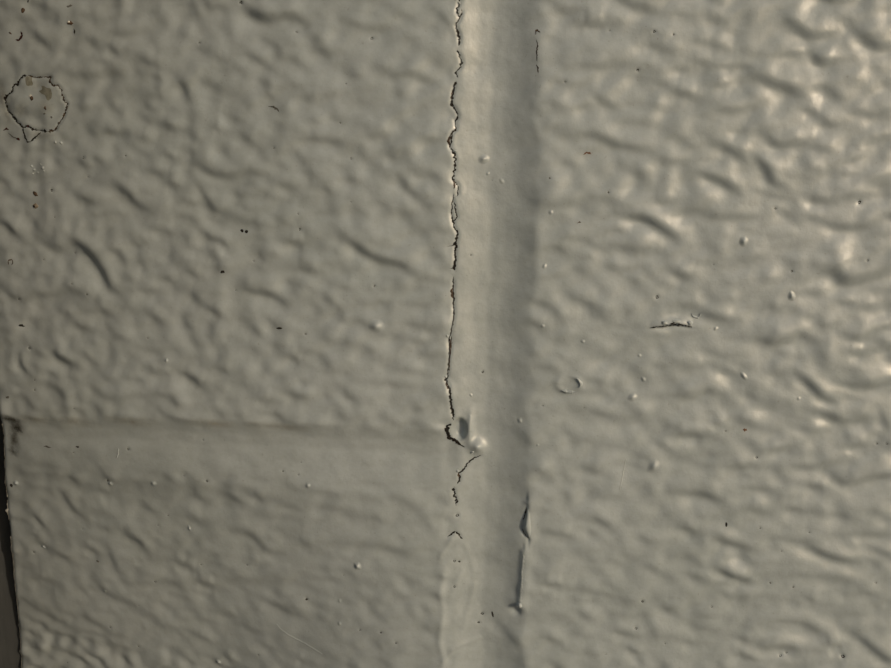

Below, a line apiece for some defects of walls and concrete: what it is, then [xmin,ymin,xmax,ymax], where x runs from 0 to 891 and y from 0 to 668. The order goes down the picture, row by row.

crack [4,74,68,143]
crack [444,0,463,420]
crack [452,455,481,504]